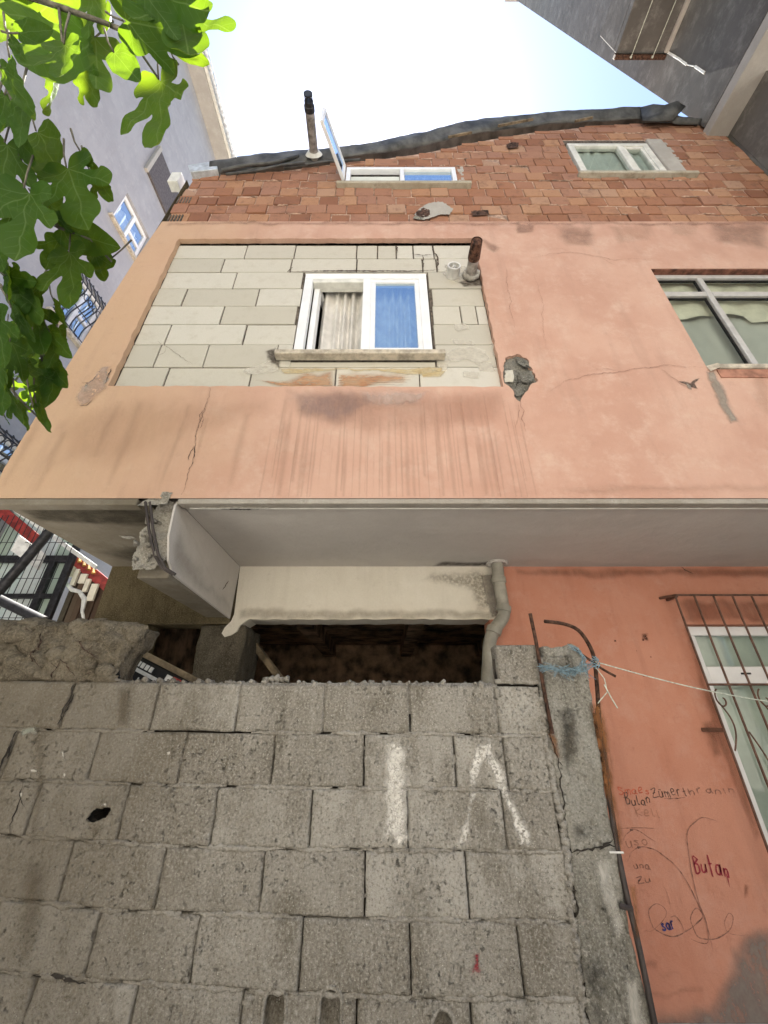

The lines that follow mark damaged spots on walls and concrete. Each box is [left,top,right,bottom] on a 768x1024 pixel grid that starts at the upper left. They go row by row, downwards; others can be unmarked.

flaking render [78,367,111,406]
corrosion [266,374,403,387]
spalling [503,356,537,401]
crack [183,392,210,492]
spalling [131,492,177,576]
crack [547,721,615,854]
crack [572,886,580,918]